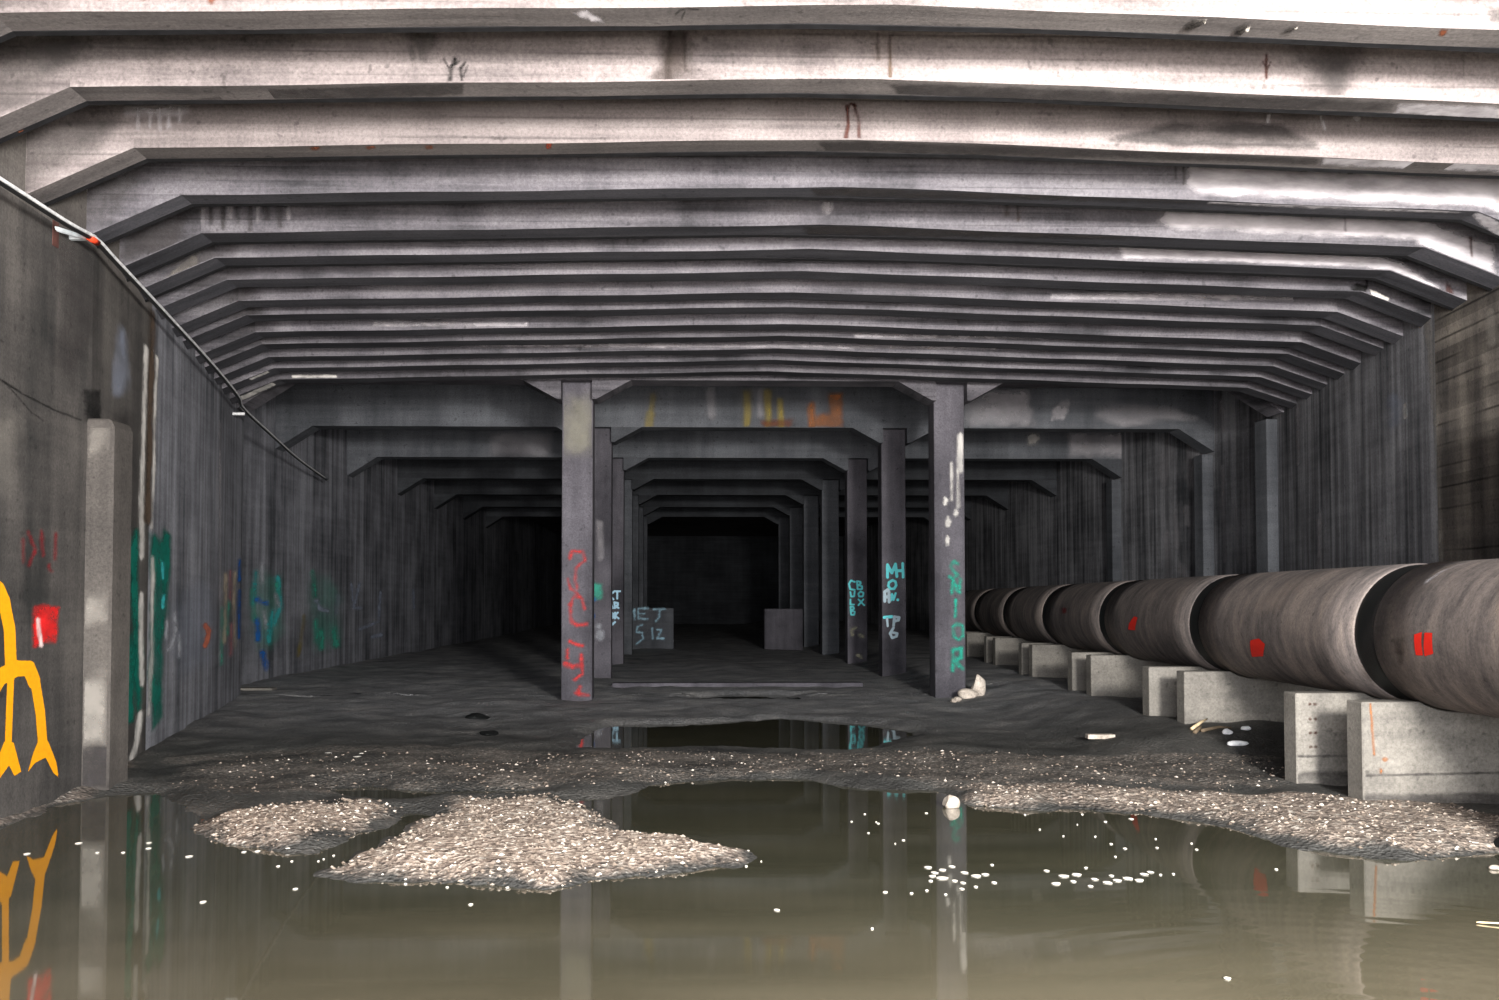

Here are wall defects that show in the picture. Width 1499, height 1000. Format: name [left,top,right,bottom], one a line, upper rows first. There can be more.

corrosion [844,103,860,138]